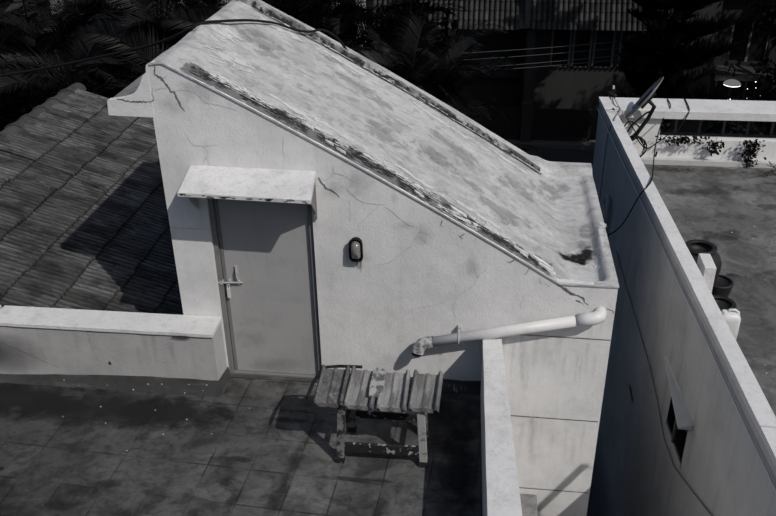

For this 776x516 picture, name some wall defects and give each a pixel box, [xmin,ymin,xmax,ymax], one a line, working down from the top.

peeling [205,25,252,73]
crack [118,66,237,112]
peeling [251,1,542,175]
peeling [166,62,603,295]
crack [318,165,465,265]
peeling [595,222,606,268]
damp [0,386,221,426]